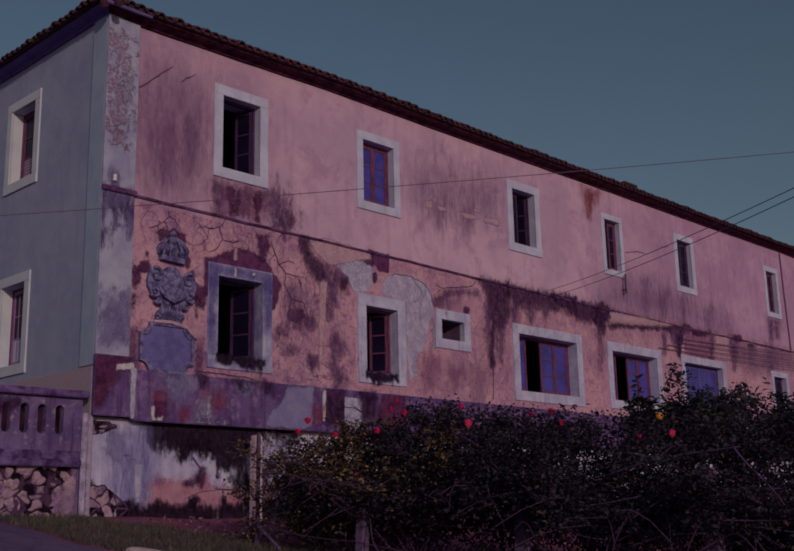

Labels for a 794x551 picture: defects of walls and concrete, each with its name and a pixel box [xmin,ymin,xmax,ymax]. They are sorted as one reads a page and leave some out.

peeling [105,27,140,151]
water stain [213,182,295,229]
corrosion [584,189,599,218]
water stain [94,251,151,409]
crack [141,210,356,387]
water stain [185,234,406,429]
peeling [310,237,436,380]
water stain [434,278,611,367]
peeling [116,363,137,418]
peeling [151,368,214,421]
water stain [126,422,298,519]
peeling [262,385,315,500]